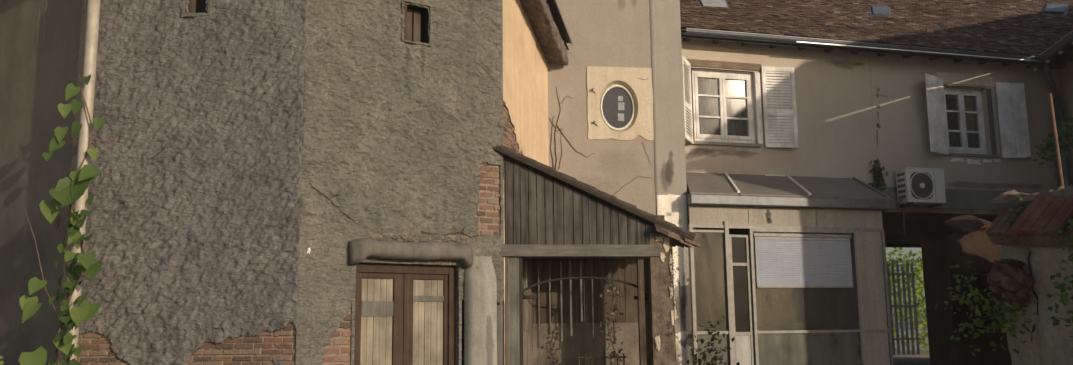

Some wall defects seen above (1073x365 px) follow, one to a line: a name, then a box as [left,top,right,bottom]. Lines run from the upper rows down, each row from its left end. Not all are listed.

spalling [363,100,523,245]
crack [309,183,361,225]
crack [421,226,479,238]
peeling [654,194,701,365]
spalling [77,332,129,365]
spalling [185,322,296,365]
spalling [322,309,352,365]